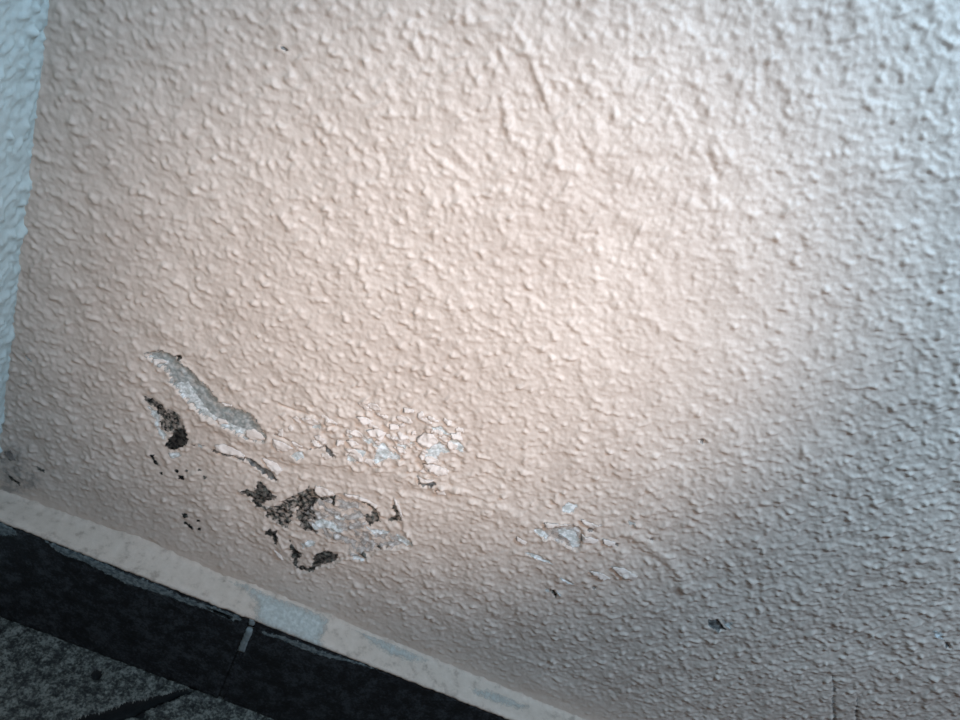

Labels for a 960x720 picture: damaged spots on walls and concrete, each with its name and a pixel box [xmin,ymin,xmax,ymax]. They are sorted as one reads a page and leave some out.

peeling [146,350,464,495]
flaking render [241,482,413,572]
peeling [534,502,618,547]
peeling [590,567,638,589]